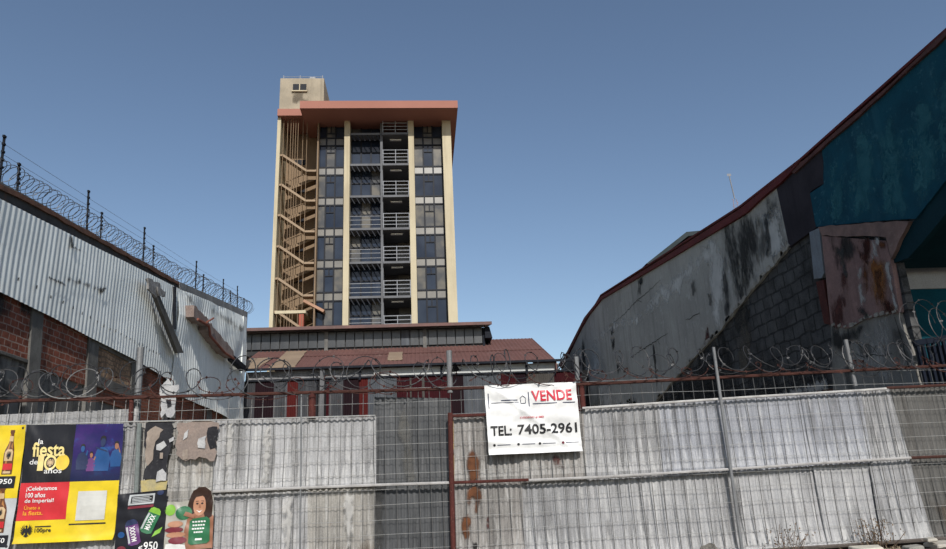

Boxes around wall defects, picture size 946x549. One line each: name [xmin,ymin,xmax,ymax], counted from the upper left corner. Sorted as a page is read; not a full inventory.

water stain [602,200,826,402]
corrosion [859,239,895,312]
water stain [571,344,614,406]
corrosion [462,450,482,539]